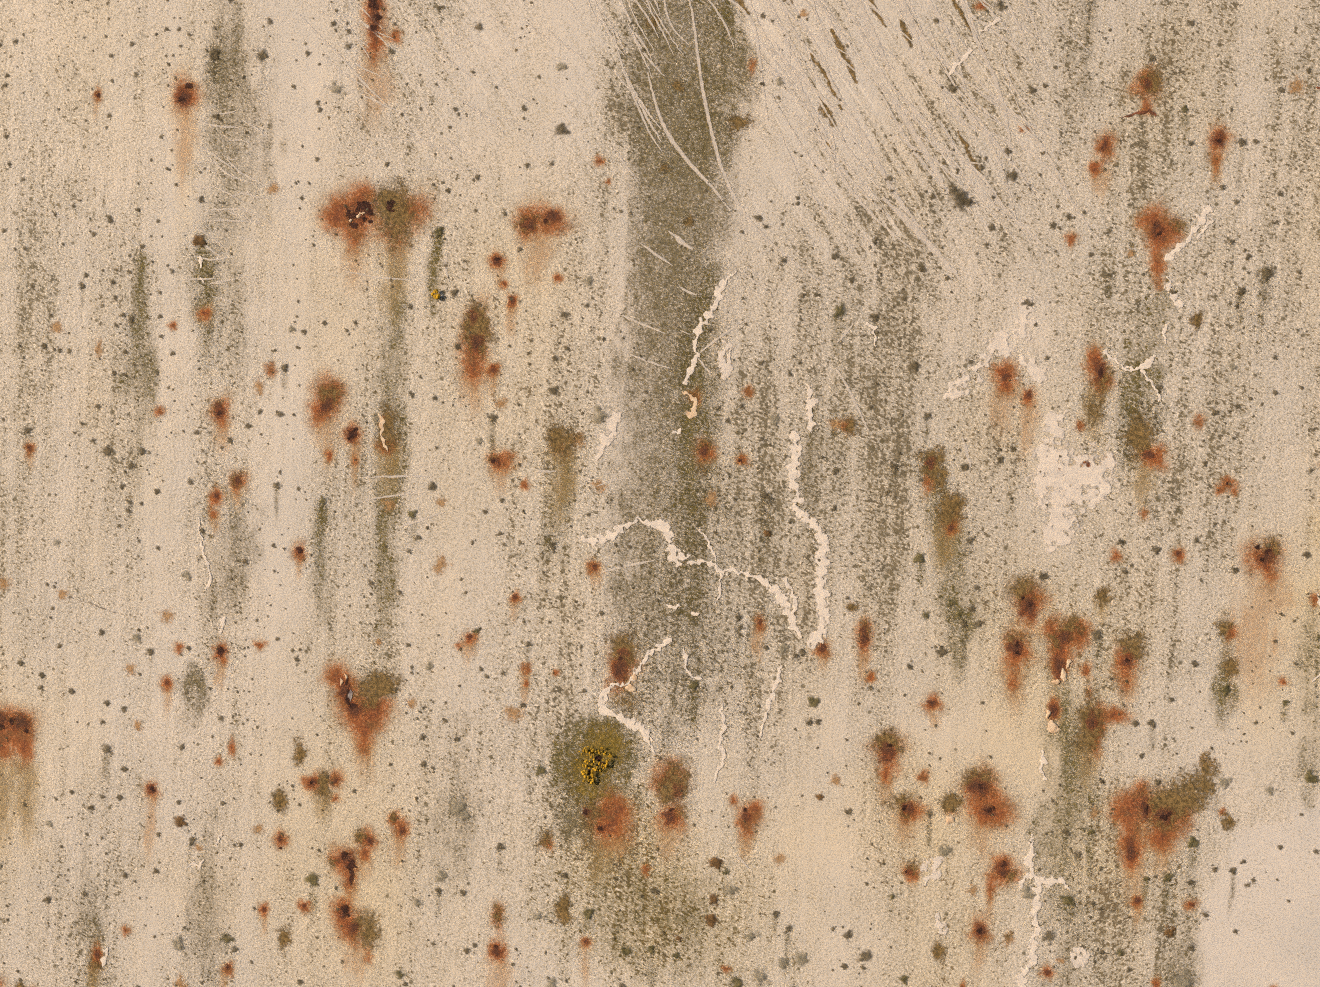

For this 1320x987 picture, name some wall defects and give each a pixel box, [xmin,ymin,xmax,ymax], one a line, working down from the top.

rust [364,0,401,62]
rust [320,176,430,299]
rust [513,205,569,239]
rust [1135,203,1186,289]
rust [459,297,500,386]
rust [324,665,416,756]
rust [1004,575,1129,775]
rust [0,706,35,822]
rust [870,727,928,825]
rust [939,768,1016,828]
rust [1092,751,1239,870]
rust [328,828,381,963]